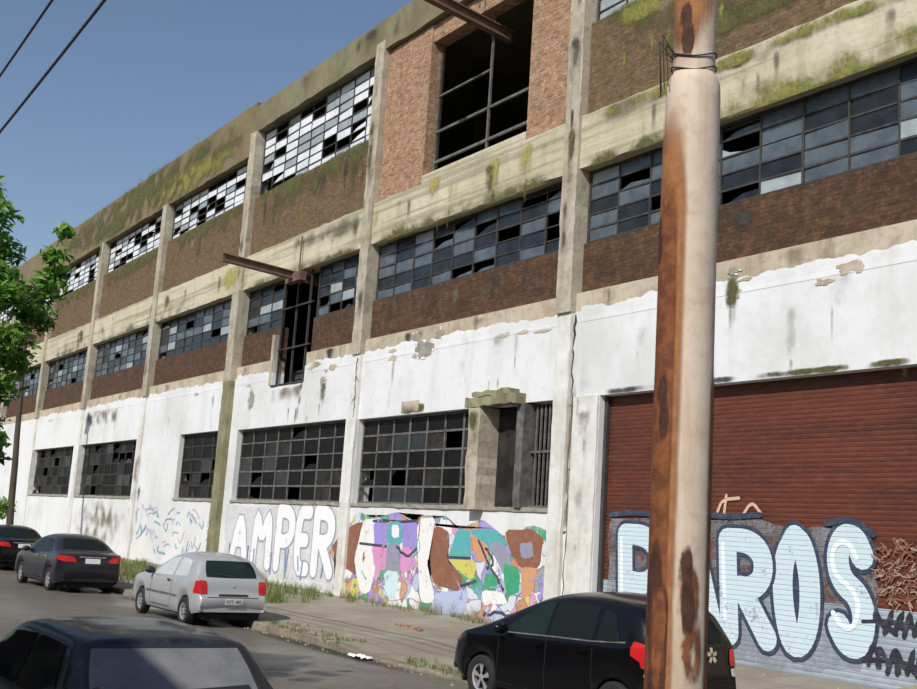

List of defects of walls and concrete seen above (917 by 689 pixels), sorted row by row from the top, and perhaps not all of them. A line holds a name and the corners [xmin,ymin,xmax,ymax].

rust [674,0,713,53]
peeling [716,240,917,307]
peeling [580,290,657,322]
peeling [364,314,558,362]
peeling [236,371,269,408]
peeling [306,354,353,386]
rust [643,128,714,689]